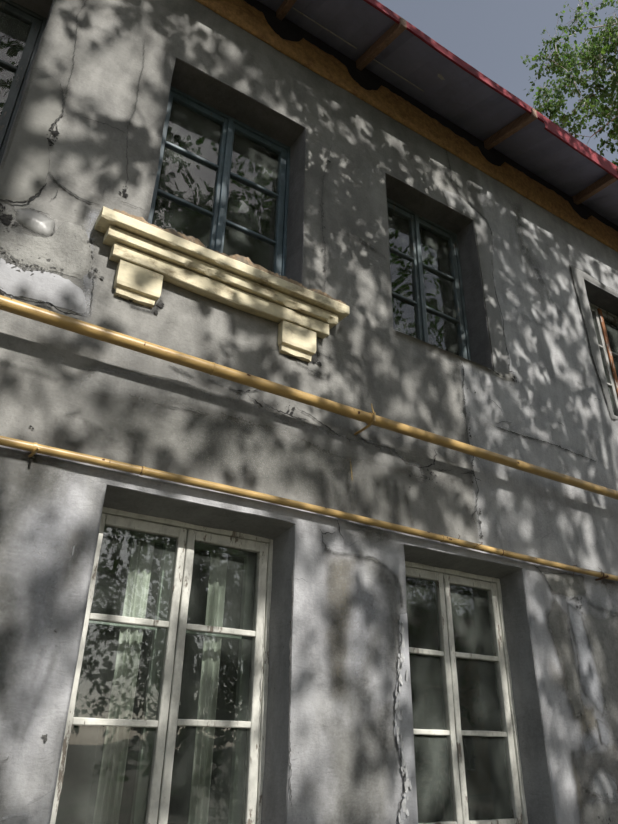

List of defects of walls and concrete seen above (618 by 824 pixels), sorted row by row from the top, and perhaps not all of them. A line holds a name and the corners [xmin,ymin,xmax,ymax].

crack [47,1,86,146]
crack [48,44,145,211]
spalling [0,203,104,280]
crack [237,389,399,456]
crack [409,361,483,539]
damp [327,549,376,691]
damp [363,557,403,660]
damp [332,708,393,824]
peeling [394,613,418,824]
damp [567,588,618,824]